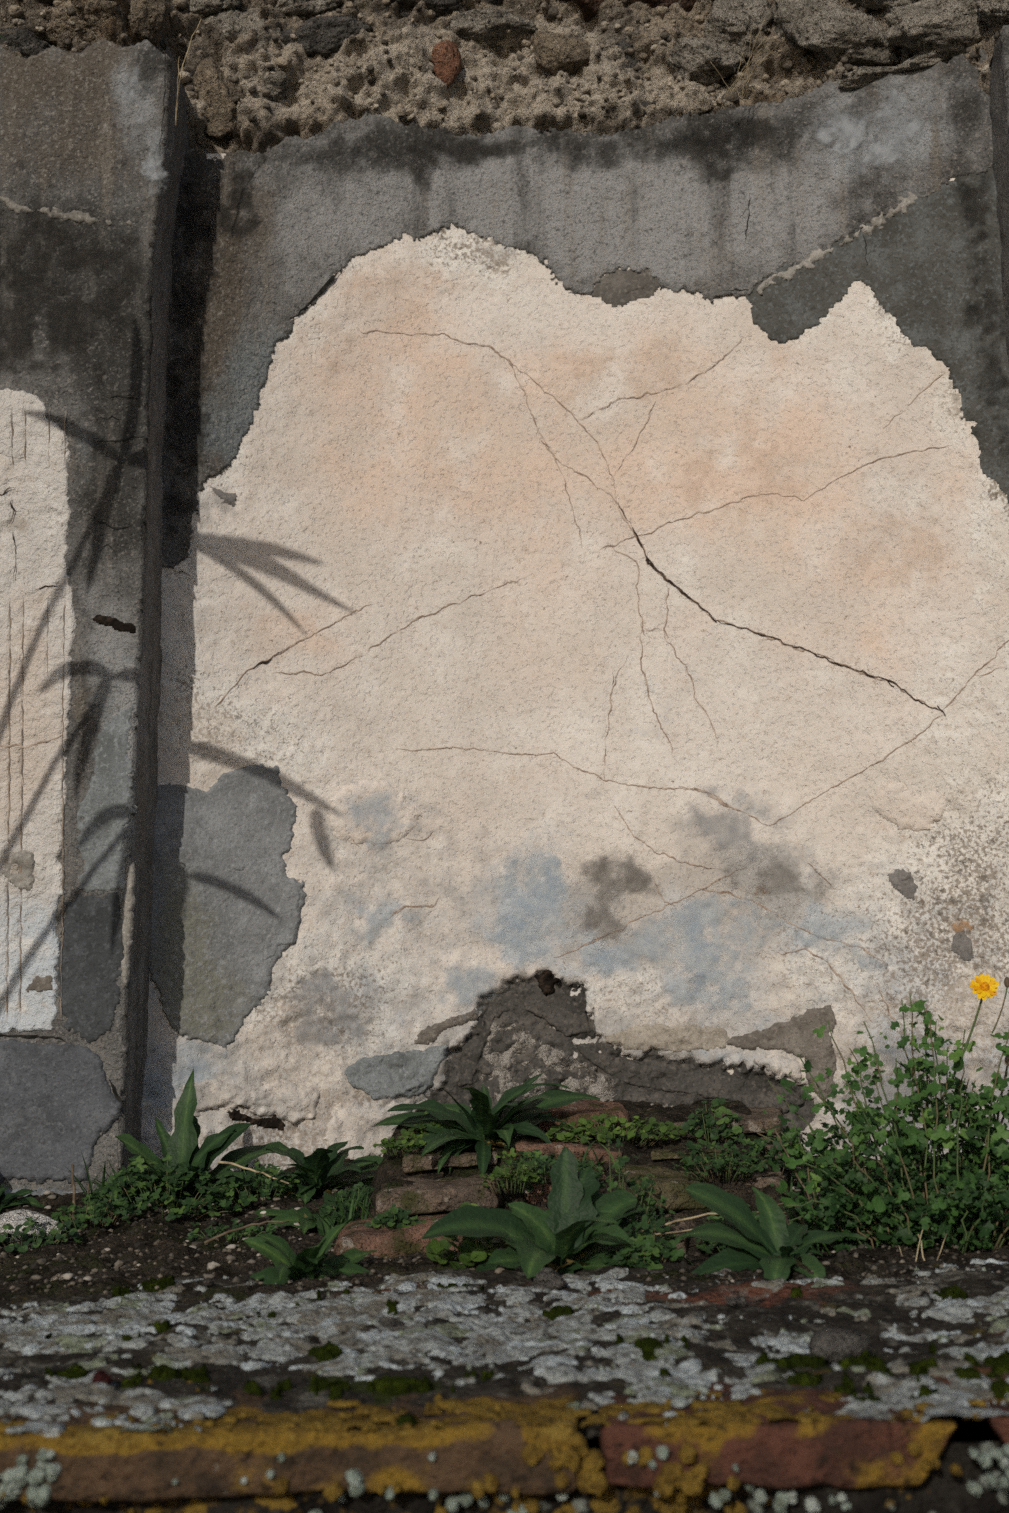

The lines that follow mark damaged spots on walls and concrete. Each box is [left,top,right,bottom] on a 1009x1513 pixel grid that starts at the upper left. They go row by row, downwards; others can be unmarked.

water stain [407,139,499,181]
water stain [684,118,771,179]
efflorescence [818,91,922,164]
water stain [0,213,137,372]
spalling [590,269,660,307]
spalling [756,192,918,295]
water stain [167,283,209,462]
spalling [210,486,238,507]
crack [216,577,524,706]
crack [360,330,1009,1050]
peeling [121,763,307,1050]
spalling [175,970,837,1160]